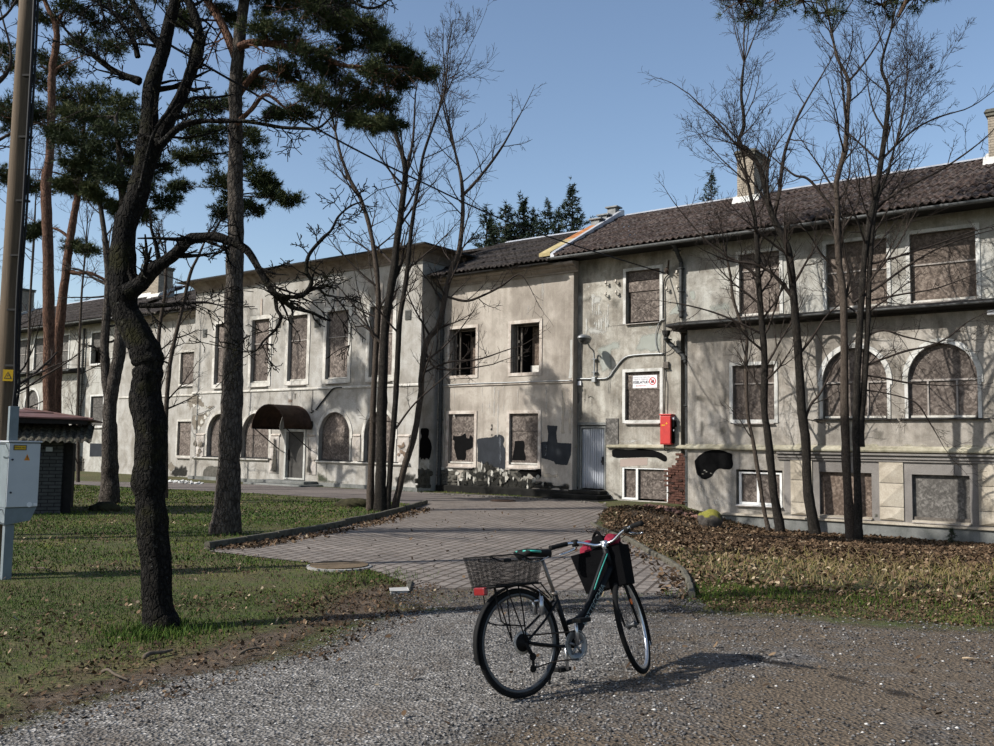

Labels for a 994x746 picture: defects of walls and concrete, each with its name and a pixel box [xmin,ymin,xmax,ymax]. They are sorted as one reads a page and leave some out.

peeling [188,395,213,457]
spalling [664,453,685,504]